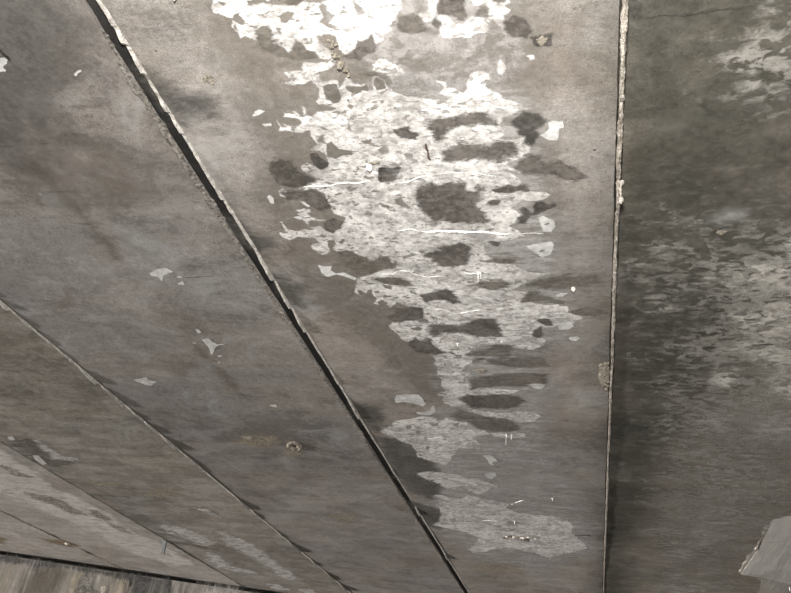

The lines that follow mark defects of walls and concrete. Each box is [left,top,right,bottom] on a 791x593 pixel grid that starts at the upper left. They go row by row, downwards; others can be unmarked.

spalling [531,34,552,46]
peeling [0,50,11,72]
peeling [541,121,564,140]
peeling [526,216,555,257]
peeling [149,268,185,285]
leakage [211,0,791,593]
peeling [192,329,225,364]
peeling [134,377,156,386]
spalling [598,362,611,391]